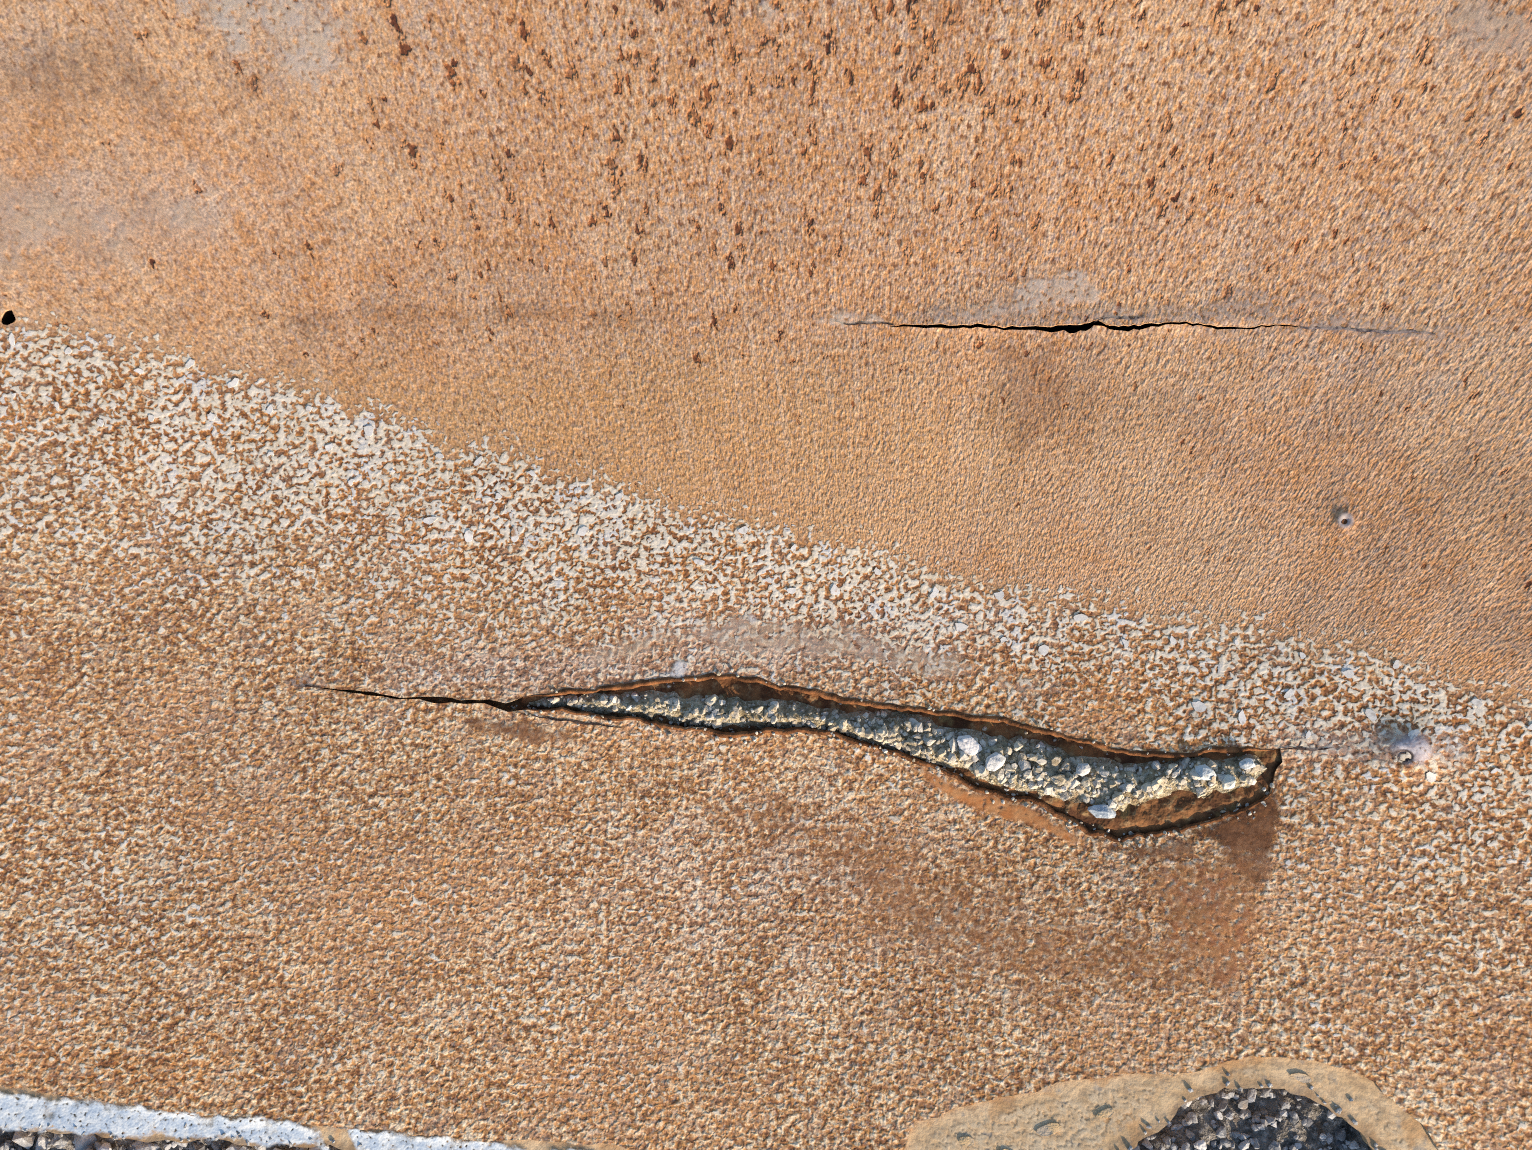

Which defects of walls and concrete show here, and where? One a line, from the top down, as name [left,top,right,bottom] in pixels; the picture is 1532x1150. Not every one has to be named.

peeling [0,311,1532,1150]
crack [835,316,1439,336]